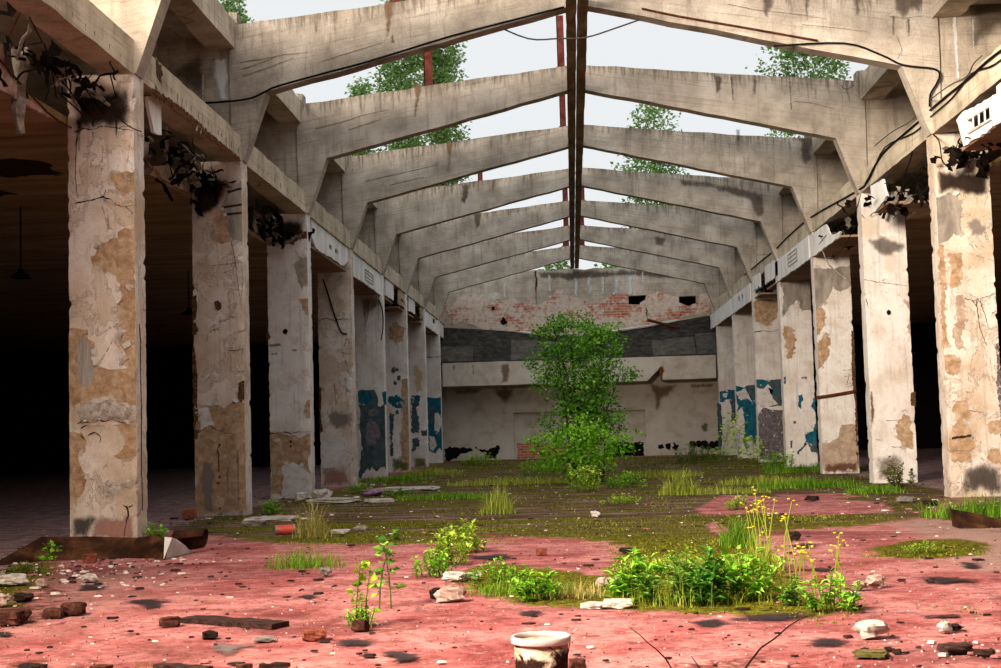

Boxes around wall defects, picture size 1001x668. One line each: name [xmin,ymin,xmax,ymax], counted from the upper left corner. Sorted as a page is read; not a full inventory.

leakage [893,0,920,32]
crack [73,123,133,212]
leakage [799,136,812,163]
spalling [69,226,137,464]
flaking render [445,289,711,334]
spalling [753,265,851,370]
spalling [936,190,969,376]
spalling [70,428,133,507]
spalling [192,295,246,516]
spalling [270,387,346,497]
peeling [357,367,501,479]
spalling [658,331,859,474]